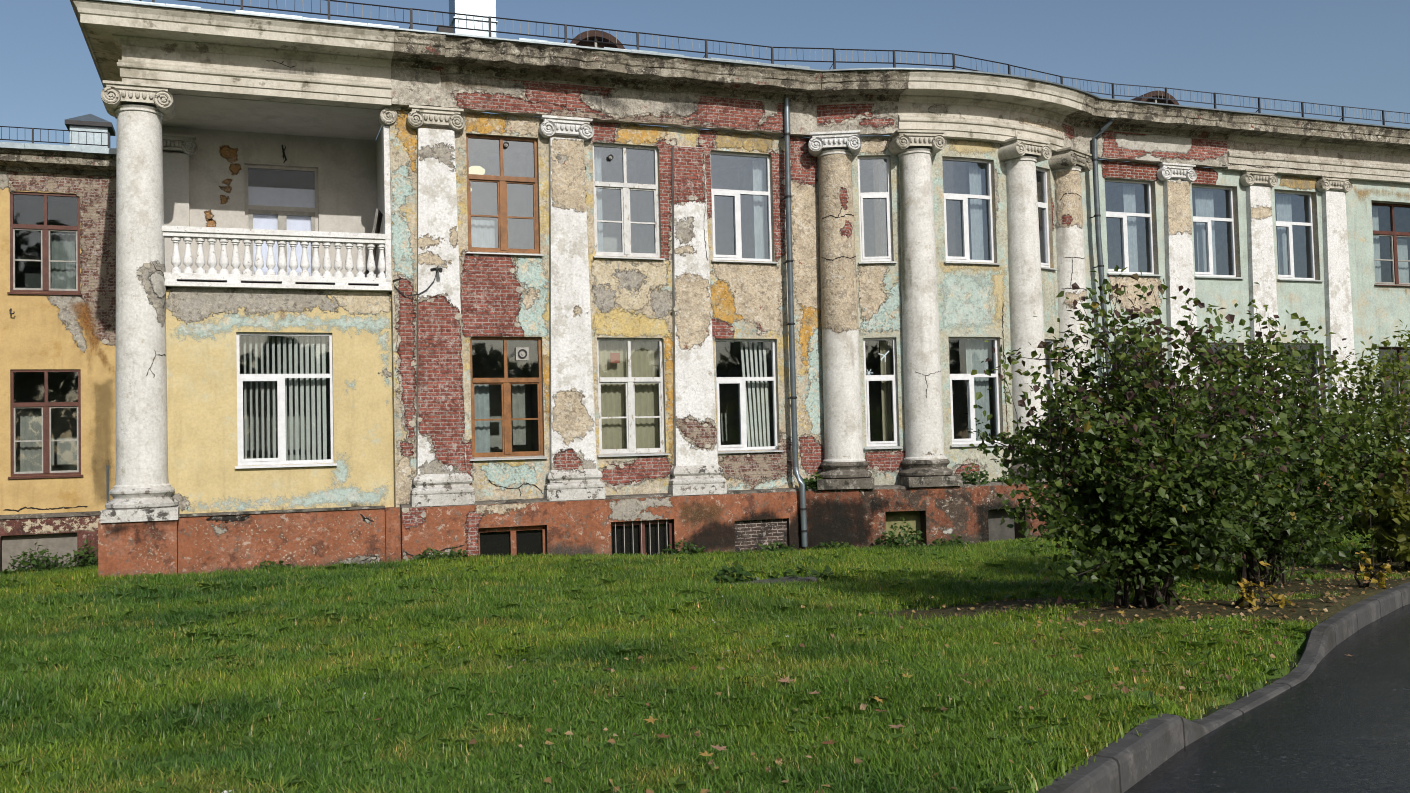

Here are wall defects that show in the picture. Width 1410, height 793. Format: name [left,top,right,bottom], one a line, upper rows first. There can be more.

flaking render [0,171,116,353]
flaking render [118,77,987,574]
flaking render [1101,131,1275,235]
peeling [0,516,100,534]